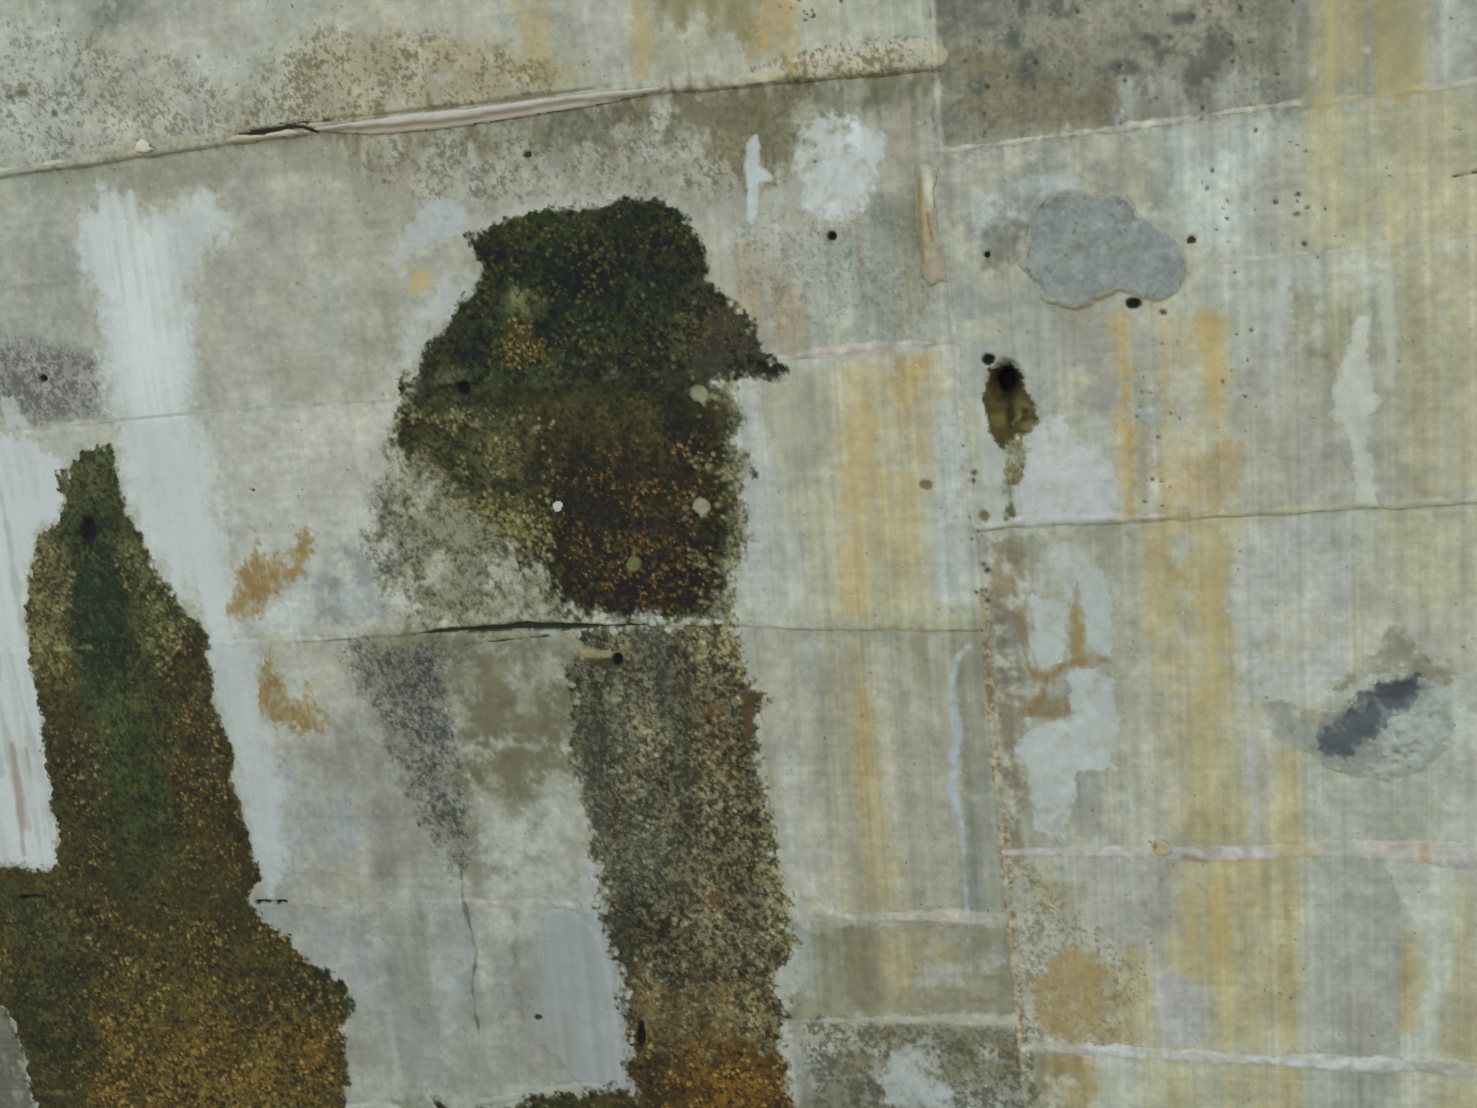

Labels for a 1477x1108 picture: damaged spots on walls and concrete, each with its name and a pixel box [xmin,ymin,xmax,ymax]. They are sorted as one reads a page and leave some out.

crack [238,84,612,136]
water stain [385,188,671,270]
spalling [1017,188,1192,309]
water stain [384,266,483,383]
water stain [0,389,69,871]
water stain [70,176,295,908]
rust [225,525,319,624]
crack [414,621,647,646]
rust [254,647,336,740]
spalling [1262,671,1455,784]
crack [459,867,480,1035]
water stain [0,1006,36,1108]